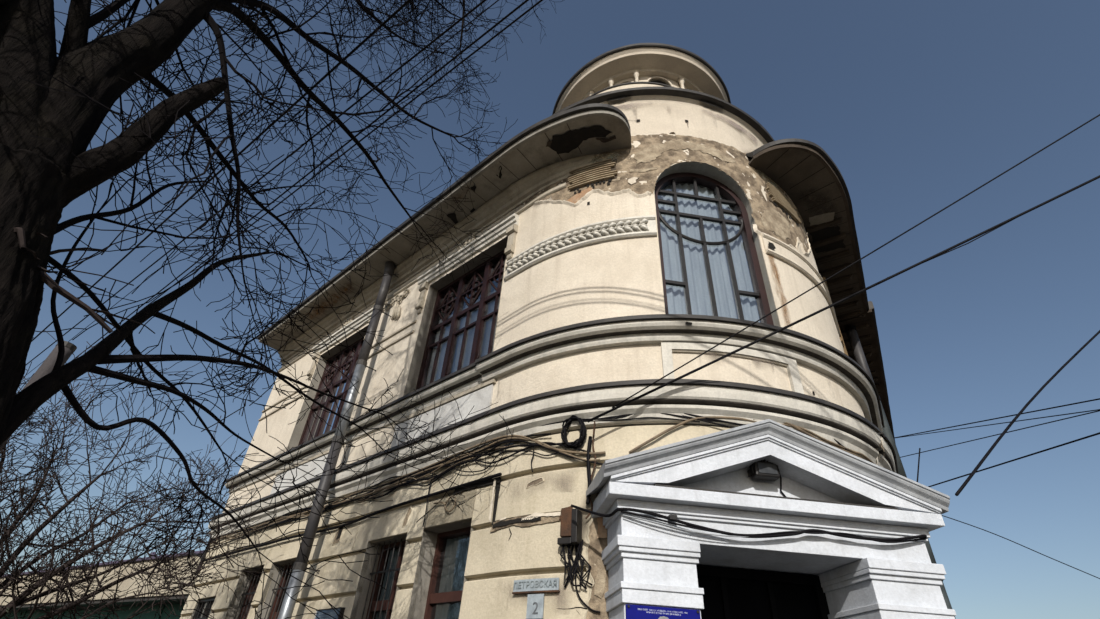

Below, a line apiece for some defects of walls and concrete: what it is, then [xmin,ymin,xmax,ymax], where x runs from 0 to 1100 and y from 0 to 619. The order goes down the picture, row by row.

spalling [513,120,812,257]